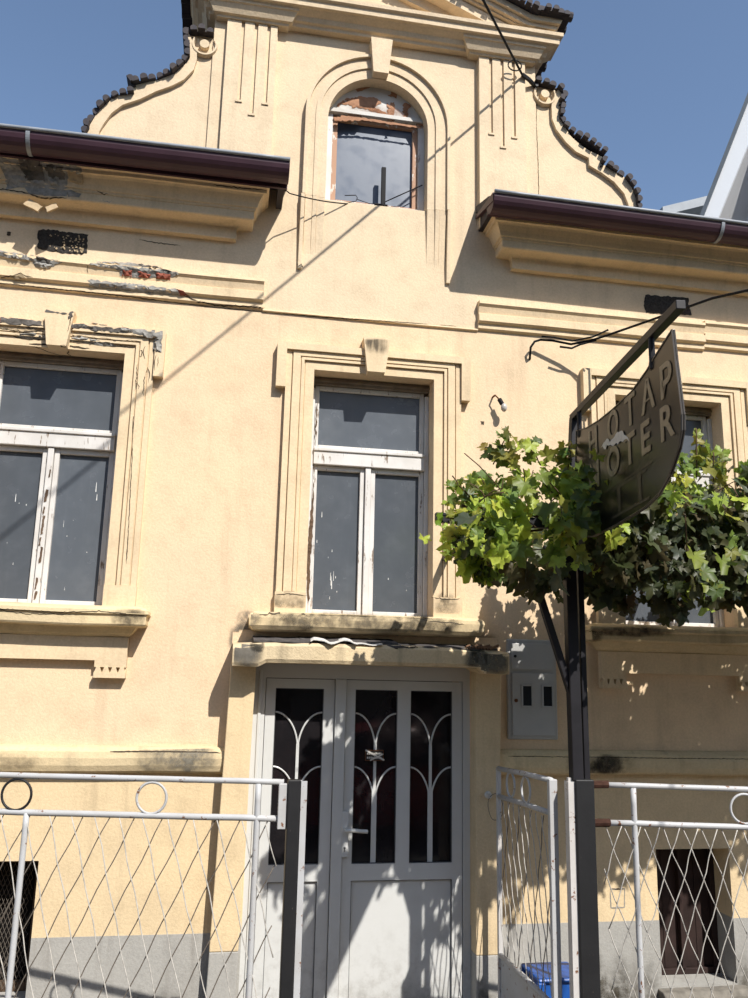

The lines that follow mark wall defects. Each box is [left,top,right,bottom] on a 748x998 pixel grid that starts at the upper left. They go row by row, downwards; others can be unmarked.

peeling [333,87,424,129]
flaking render [0,157,83,213]
flaking render [0,250,62,269]
flaking render [0,309,163,352]
damp [592,756,620,773]